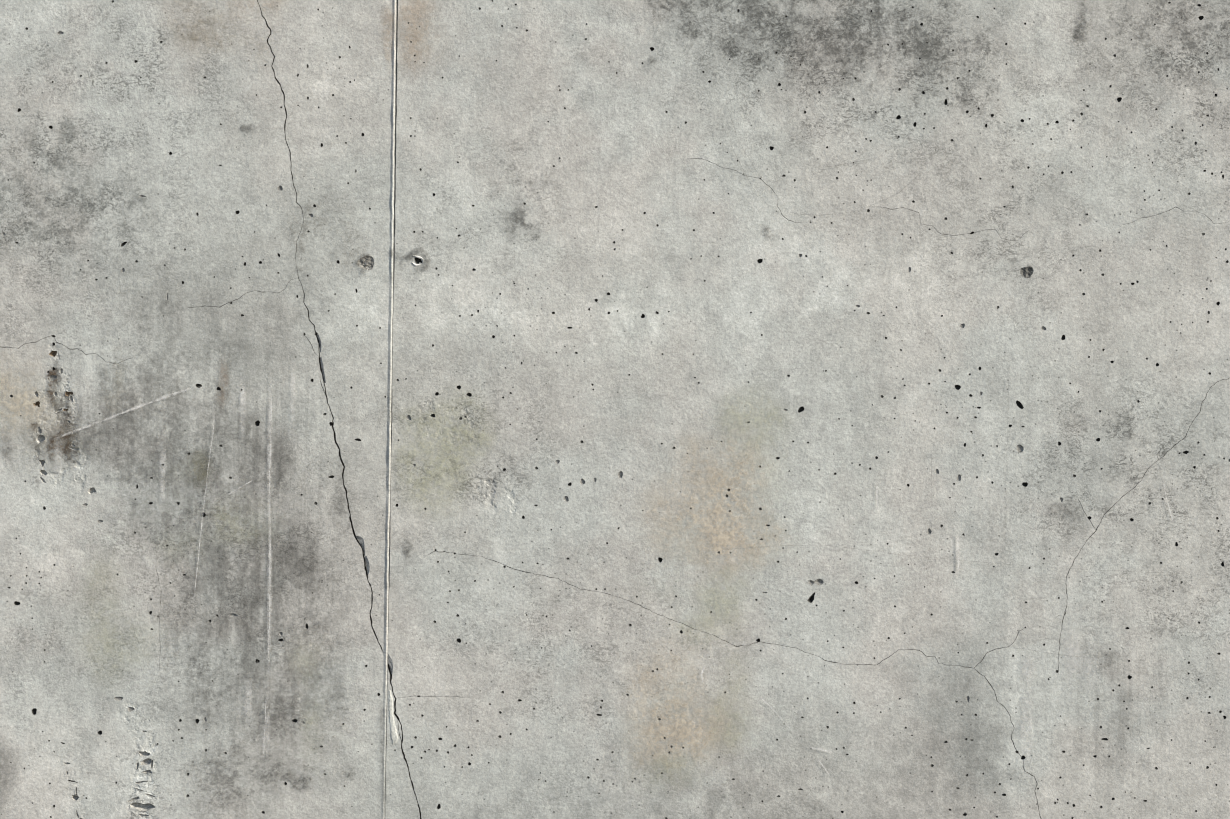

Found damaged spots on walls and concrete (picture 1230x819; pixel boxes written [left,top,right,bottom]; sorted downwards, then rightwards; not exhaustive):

crack [190,0,458,819]
crack [1058,378,1229,673]
crack [426,551,1041,818]